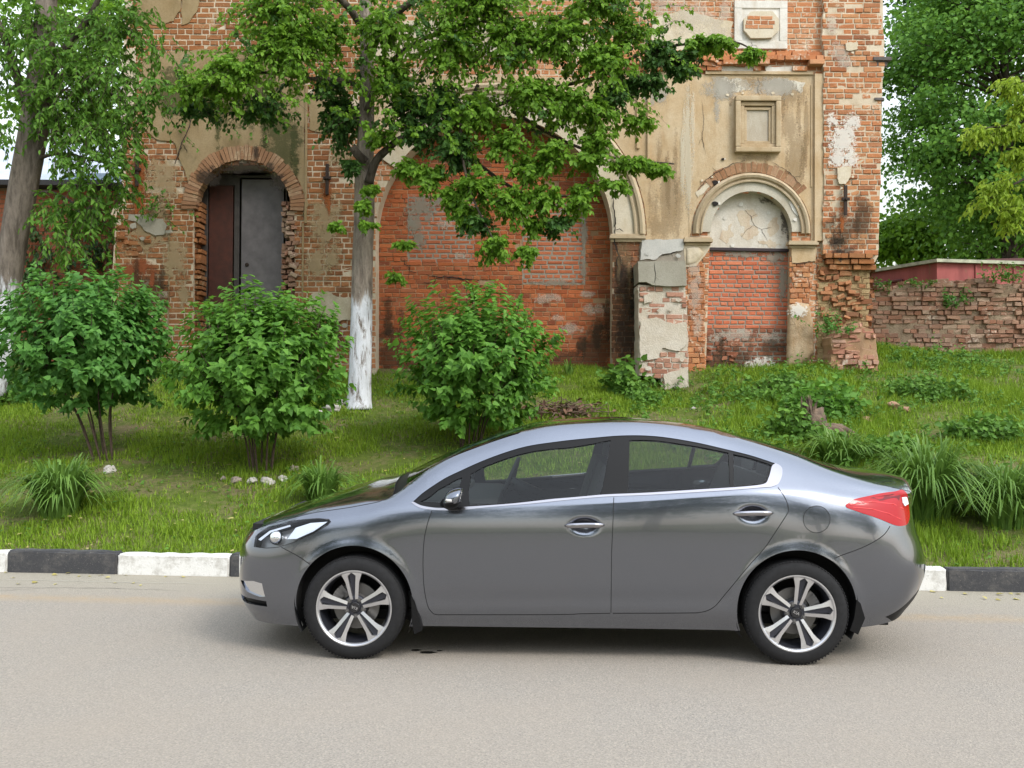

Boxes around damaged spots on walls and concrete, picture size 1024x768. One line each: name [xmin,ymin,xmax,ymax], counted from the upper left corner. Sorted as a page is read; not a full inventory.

peeling [115,214,173,256]
crack [404,259,482,286]
peeling [640,239,684,260]
spalling [818,270,864,326]
water stain [826,195,874,262]
peeling [639,293,689,389]